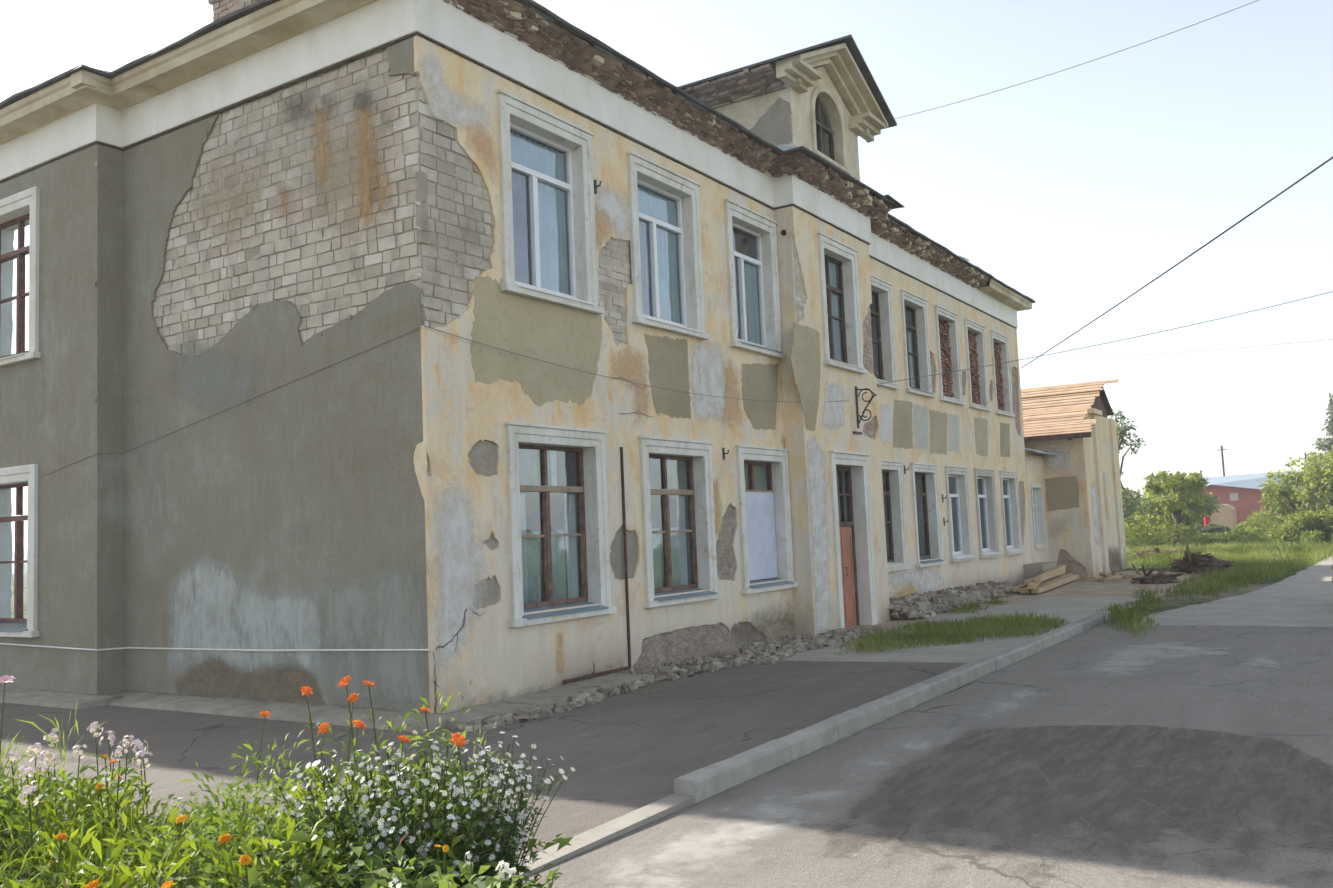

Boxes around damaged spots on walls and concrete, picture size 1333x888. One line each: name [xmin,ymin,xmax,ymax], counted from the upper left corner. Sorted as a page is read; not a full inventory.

spalling [750,98,793,146]
spalling [153,49,632,406]
peeling [644,334,691,419]
spalling [467,438,497,477]
damp [436,488,484,663]
spalling [472,575,499,610]
spalling [609,524,642,581]
spalling [716,503,739,581]
damp [171,561,423,704]
crack [433,609,485,713]
spalling [632,621,766,672]